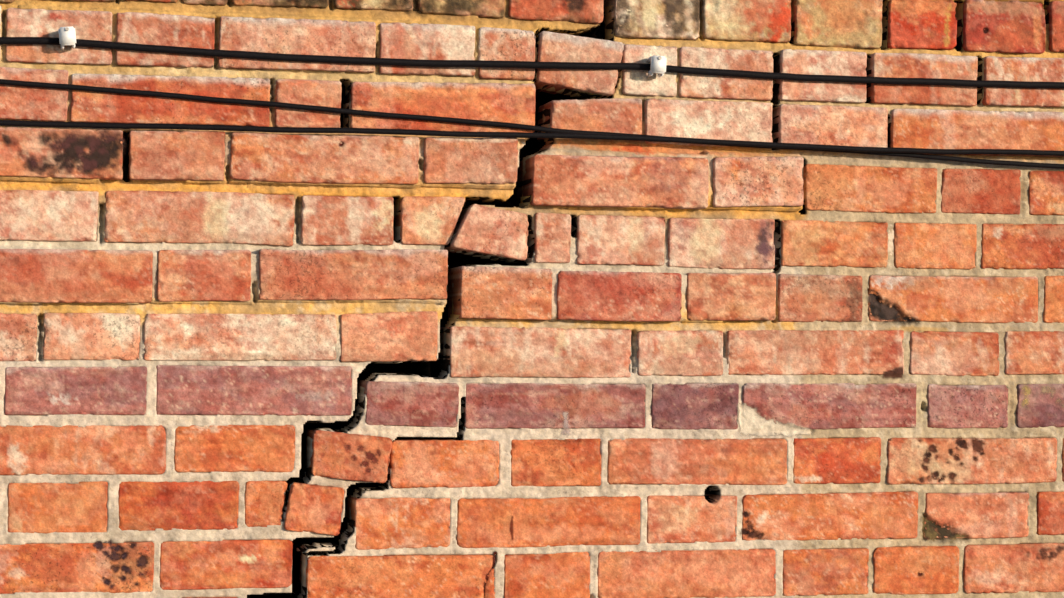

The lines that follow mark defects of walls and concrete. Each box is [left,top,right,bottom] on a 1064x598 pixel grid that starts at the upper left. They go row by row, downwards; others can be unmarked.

water stain [3,129,124,175]
crack [283,7,621,512]
spalling [868,290,919,323]
crack [247,467,391,598]
crack [484,517,513,598]